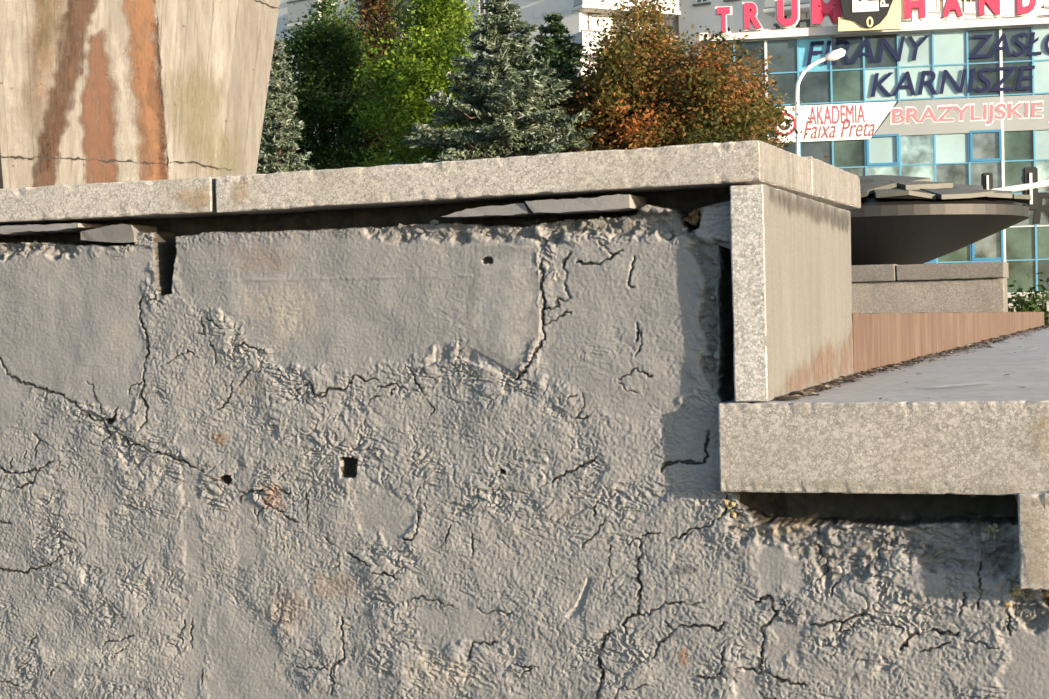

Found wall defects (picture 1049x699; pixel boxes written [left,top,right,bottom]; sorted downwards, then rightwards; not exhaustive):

rust [29,0,118,187]
crack [1,0,232,178]
rust [124,0,167,181]
crack [0,297,309,523]
spalling [340,457,358,478]
crack [299,372,435,414]
flaking render [401,341,518,380]
spalling [368,194,731,347]
crack [515,242,635,380]
crack [303,617,345,694]
crack [582,495,1011,699]
spalling [790,517,1019,580]